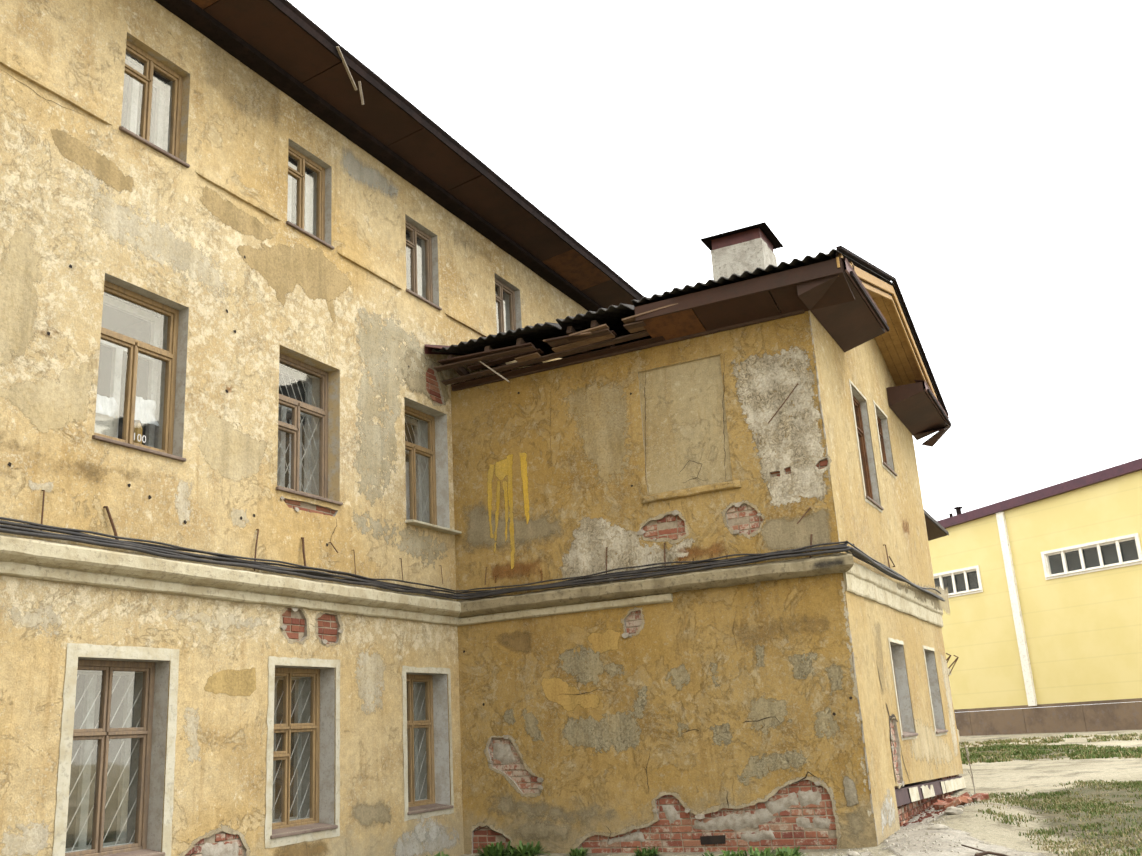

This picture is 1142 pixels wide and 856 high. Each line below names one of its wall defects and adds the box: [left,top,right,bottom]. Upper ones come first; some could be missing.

peeling [721,346,832,539]
peeling [558,510,695,585]
spalling [279,607,343,647]
spalling [484,708,544,798]
peeling [541,607,648,755]
peeling [747,696,792,735]
peeling [1,819,51,856]
spalling [179,824,251,856]
spalling [470,822,512,854]
spalling [573,749,841,853]